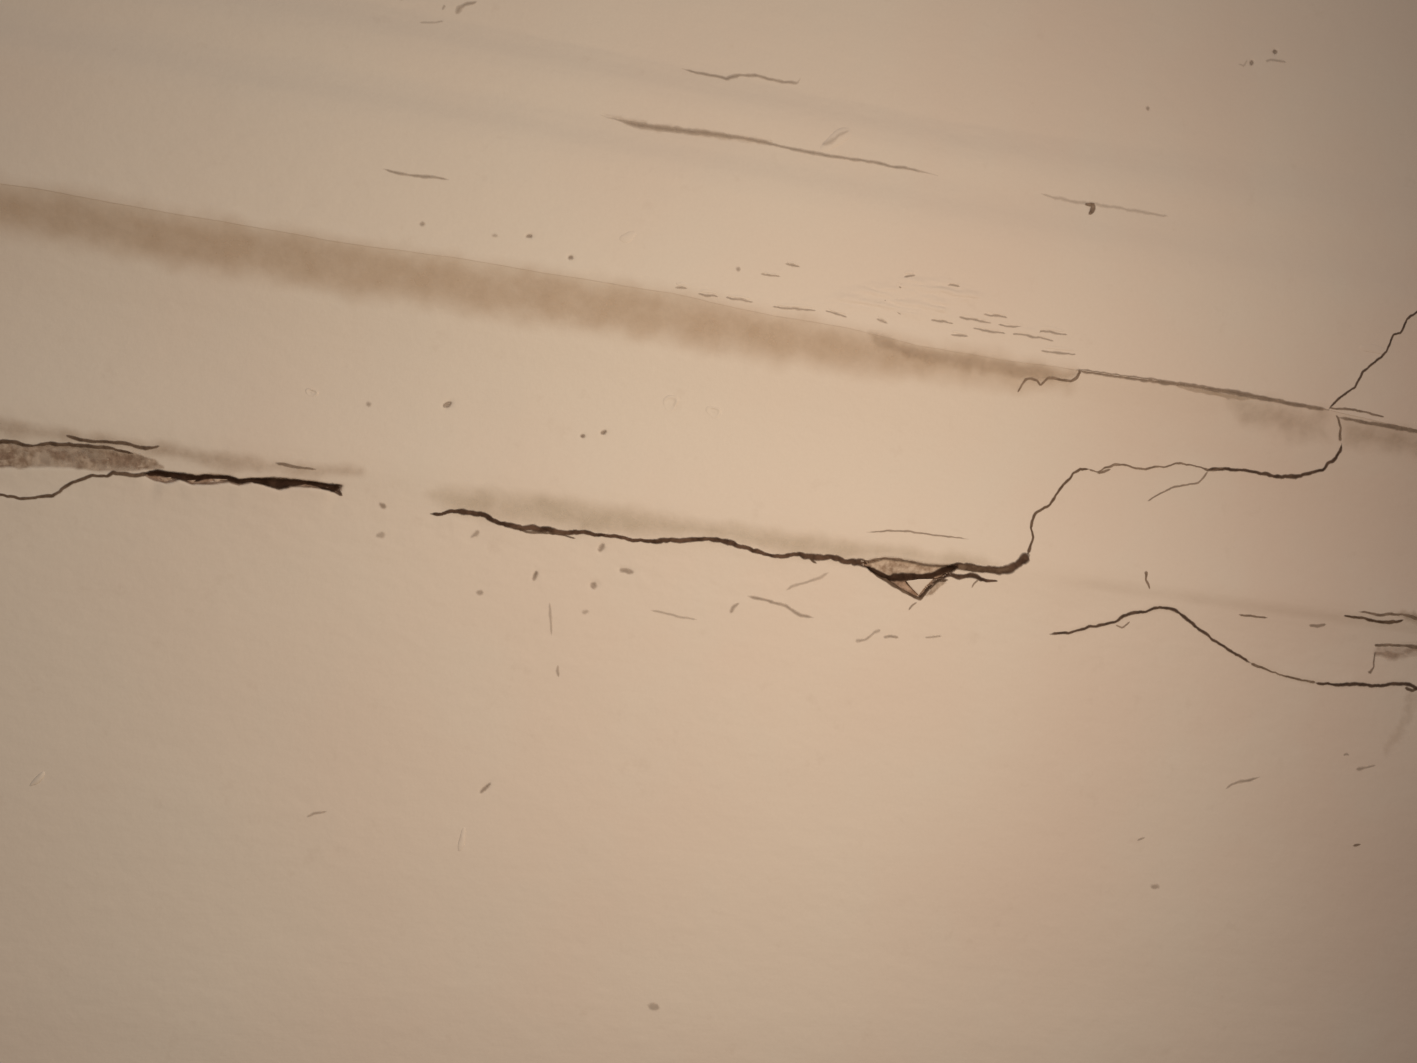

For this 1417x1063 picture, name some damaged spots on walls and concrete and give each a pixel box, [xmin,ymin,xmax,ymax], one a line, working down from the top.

peeling [0,435,162,470]
crack [931,311,1417,586]
crack [0,463,342,500]
crack [432,509,890,581]
spalling [862,557,957,600]
crack [1053,572,1417,692]
peeling [1369,644,1417,673]